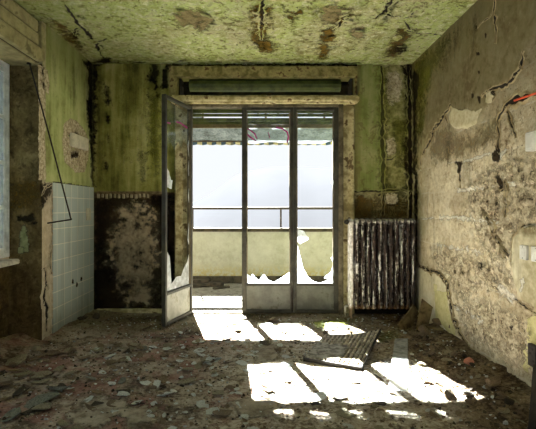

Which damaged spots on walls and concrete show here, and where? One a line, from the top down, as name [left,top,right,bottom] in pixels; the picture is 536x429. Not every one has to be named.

crack [63,4,108,58]
rust [248,5,280,55]
spalling [62,118,89,173]
damp [47,15,144,187]
crack [171,58,451,219]
damp [354,64,498,262]
peeling [449,88,495,129]
crack [481,50,525,138]
crack [40,180,92,337]
damp [94,194,175,309]
crack [416,263,474,350]
spalling [433,146,536,372]